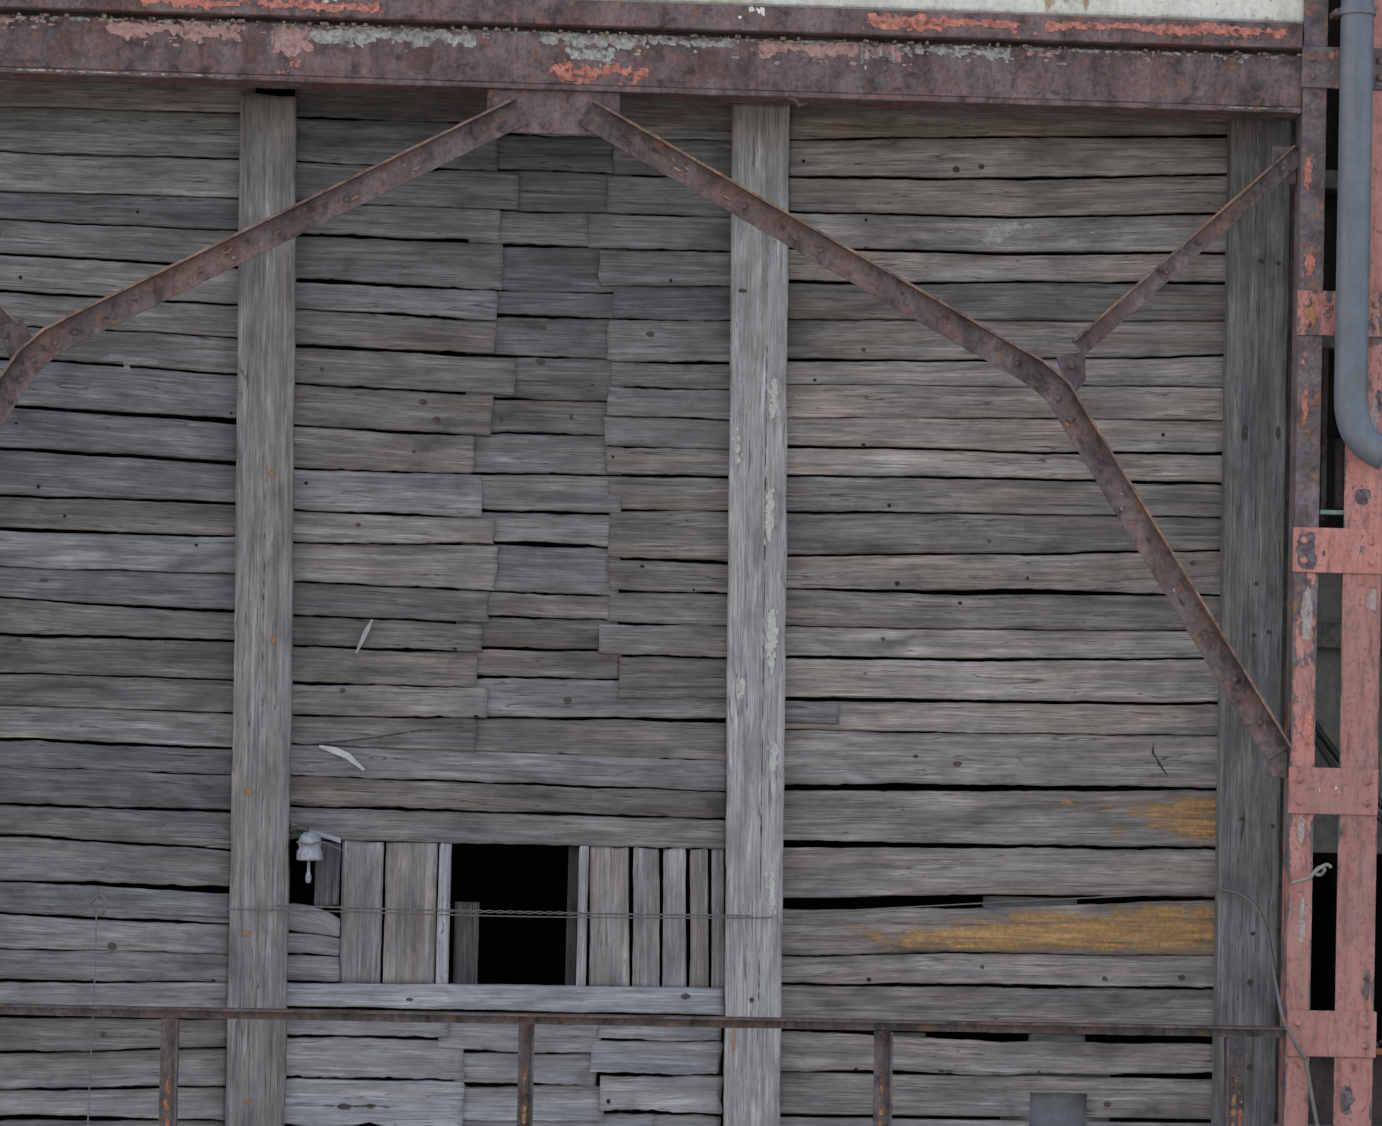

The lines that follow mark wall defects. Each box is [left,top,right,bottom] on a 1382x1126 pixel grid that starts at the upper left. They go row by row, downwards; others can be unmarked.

peeling [0,0,1298,86]